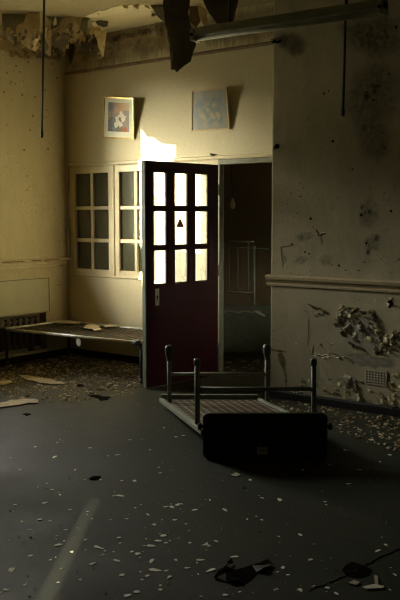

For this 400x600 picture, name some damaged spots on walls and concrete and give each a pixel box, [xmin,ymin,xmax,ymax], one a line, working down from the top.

damp [67,22,167,67]
peeling [0,0,238,73]
peeling [333,304,400,355]